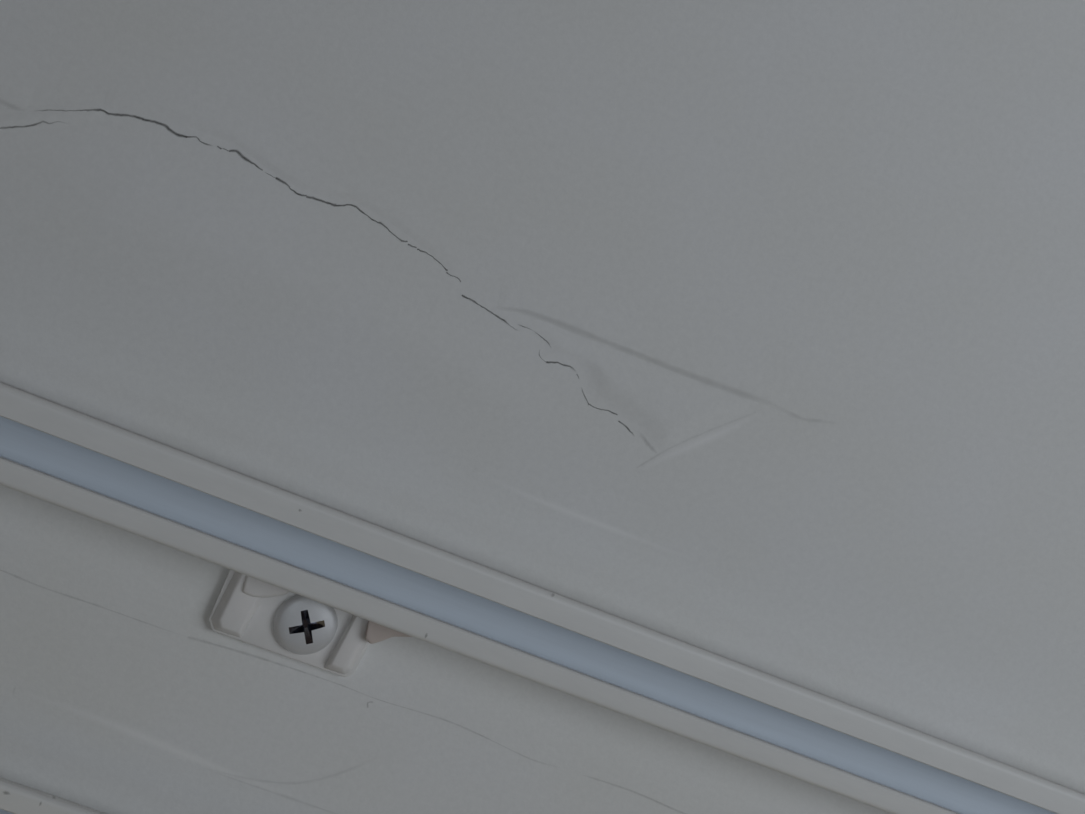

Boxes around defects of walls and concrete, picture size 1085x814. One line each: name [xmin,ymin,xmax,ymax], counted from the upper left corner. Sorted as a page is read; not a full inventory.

crack [0,101,106,134]
crack [462,295,632,433]